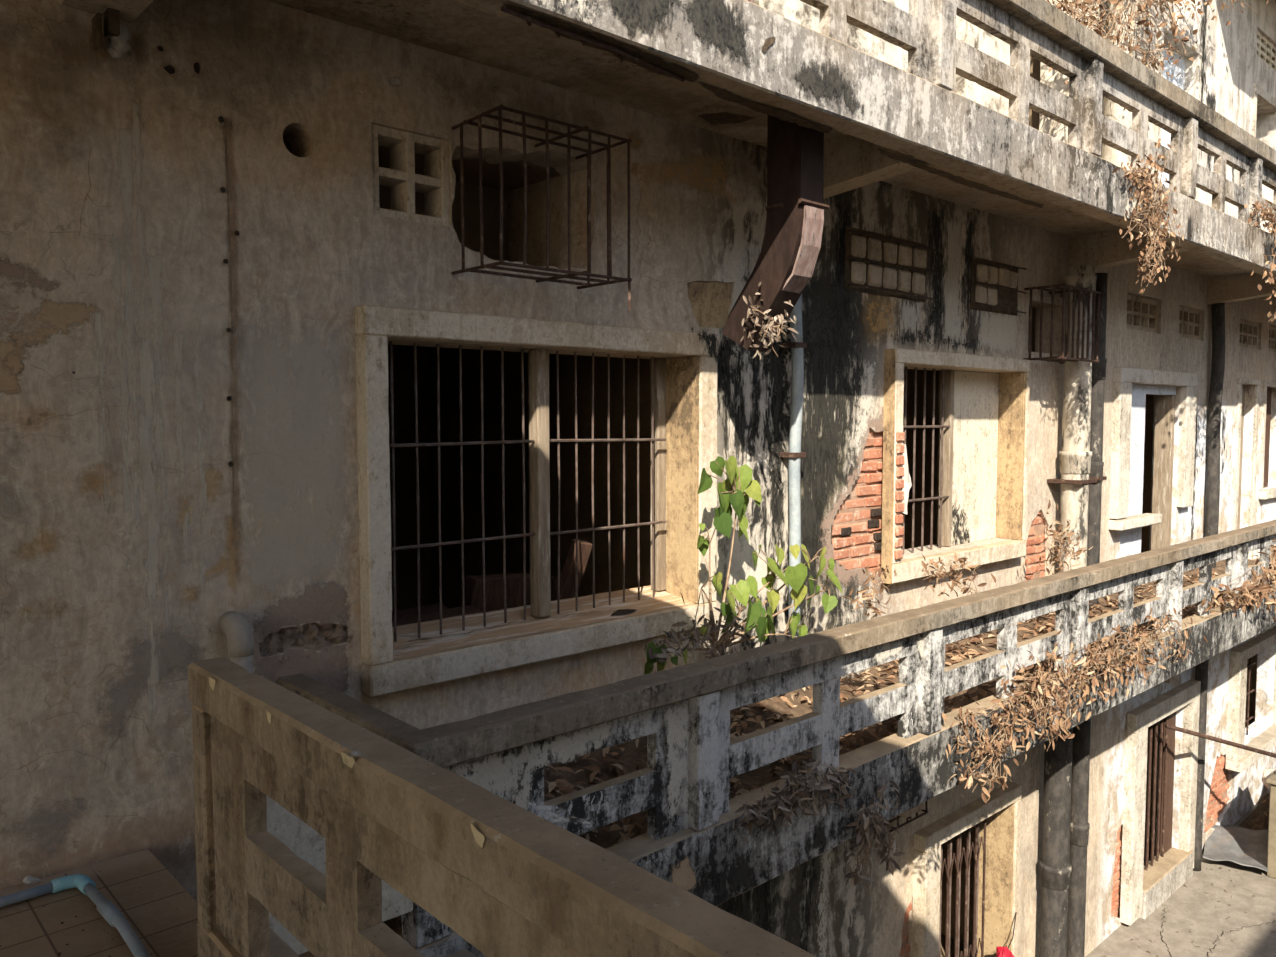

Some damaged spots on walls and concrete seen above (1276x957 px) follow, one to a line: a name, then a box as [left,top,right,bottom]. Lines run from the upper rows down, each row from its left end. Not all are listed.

water stain [543,0,595,24]
water stain [608,0,755,69]
water stain [790,59,865,113]
peeling [0,259,99,394]
water stain [691,200,1022,620]
flaking render [818,408,905,602]
peeling [252,581,352,692]
water stain [874,634,924,663]
water stain [449,721,613,812]
water stain [664,703,691,818]
water stain [798,815,848,957]
crack [1207,920,1276,957]